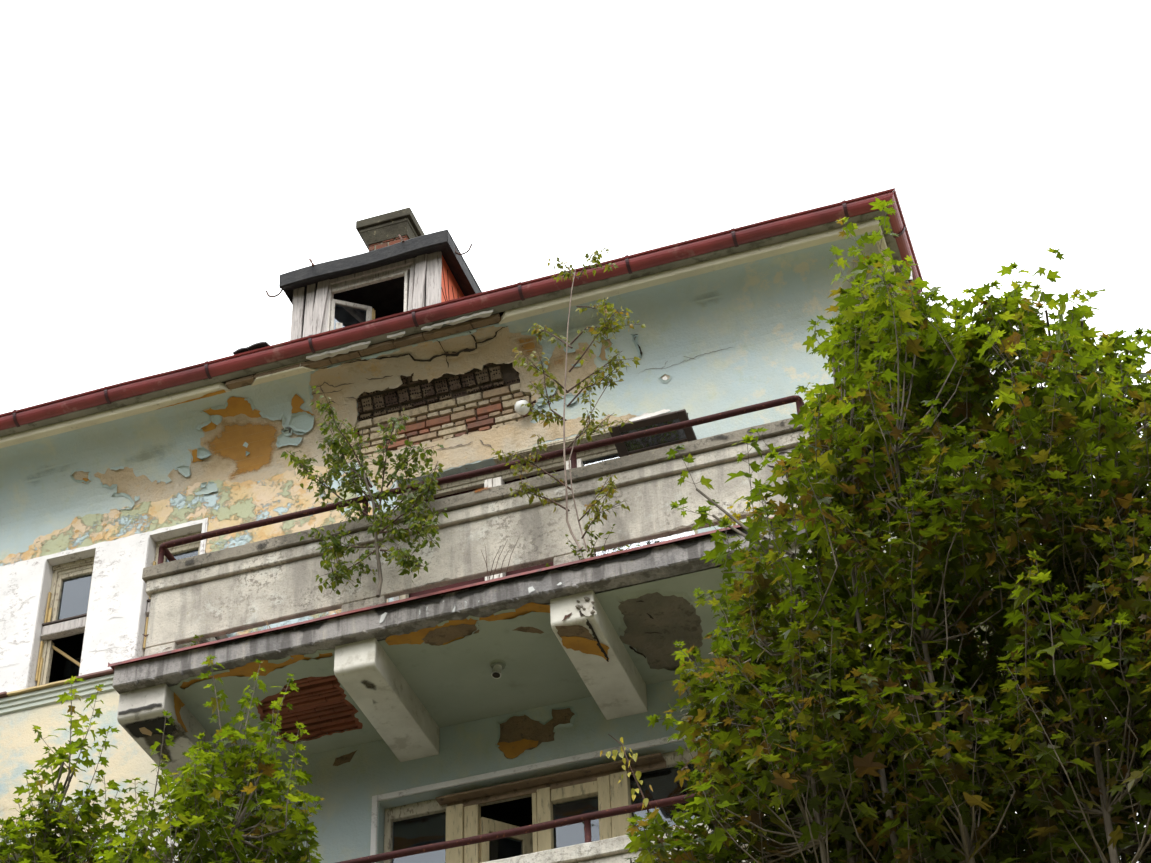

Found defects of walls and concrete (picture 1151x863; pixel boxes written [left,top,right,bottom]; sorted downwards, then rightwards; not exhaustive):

crack [310,326,507,404]
peeling [0,323,671,566]
peeling [226,609,341,638]
spalling [362,584,704,671]
peeling [174,637,335,732]
spalling [256,675,363,744]
peeling [495,706,578,759]